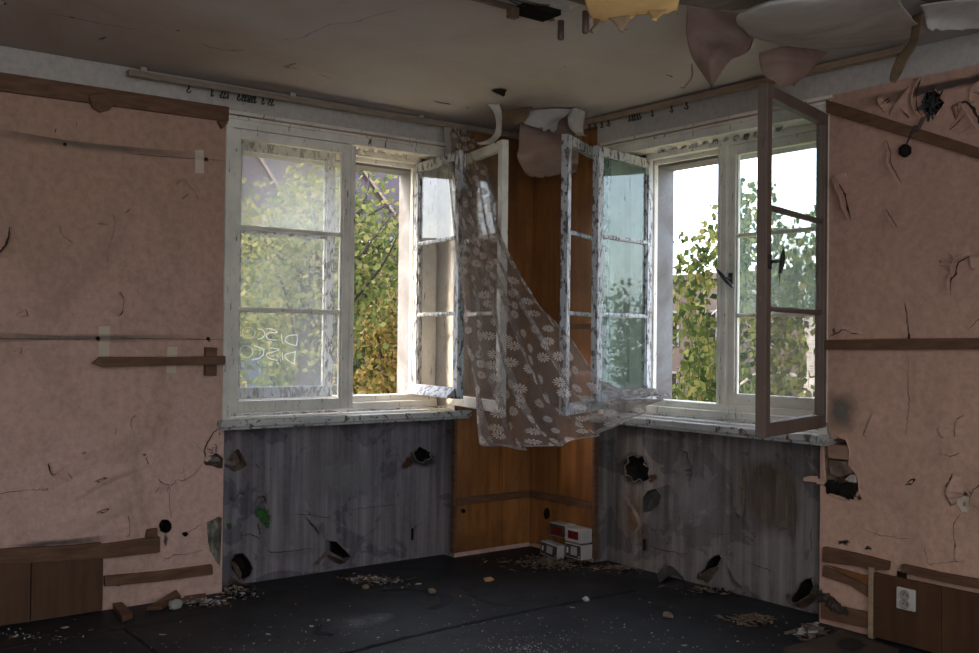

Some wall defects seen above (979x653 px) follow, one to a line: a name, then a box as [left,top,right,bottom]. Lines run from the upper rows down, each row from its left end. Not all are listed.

spalling [889,77,979,157]
spalling [206,515,254,586]
spalling [327,540,352,564]
spalling [624,454,662,514]
spalling [697,553,724,583]
spalling [822,433,861,501]
crack [933,469,979,564]